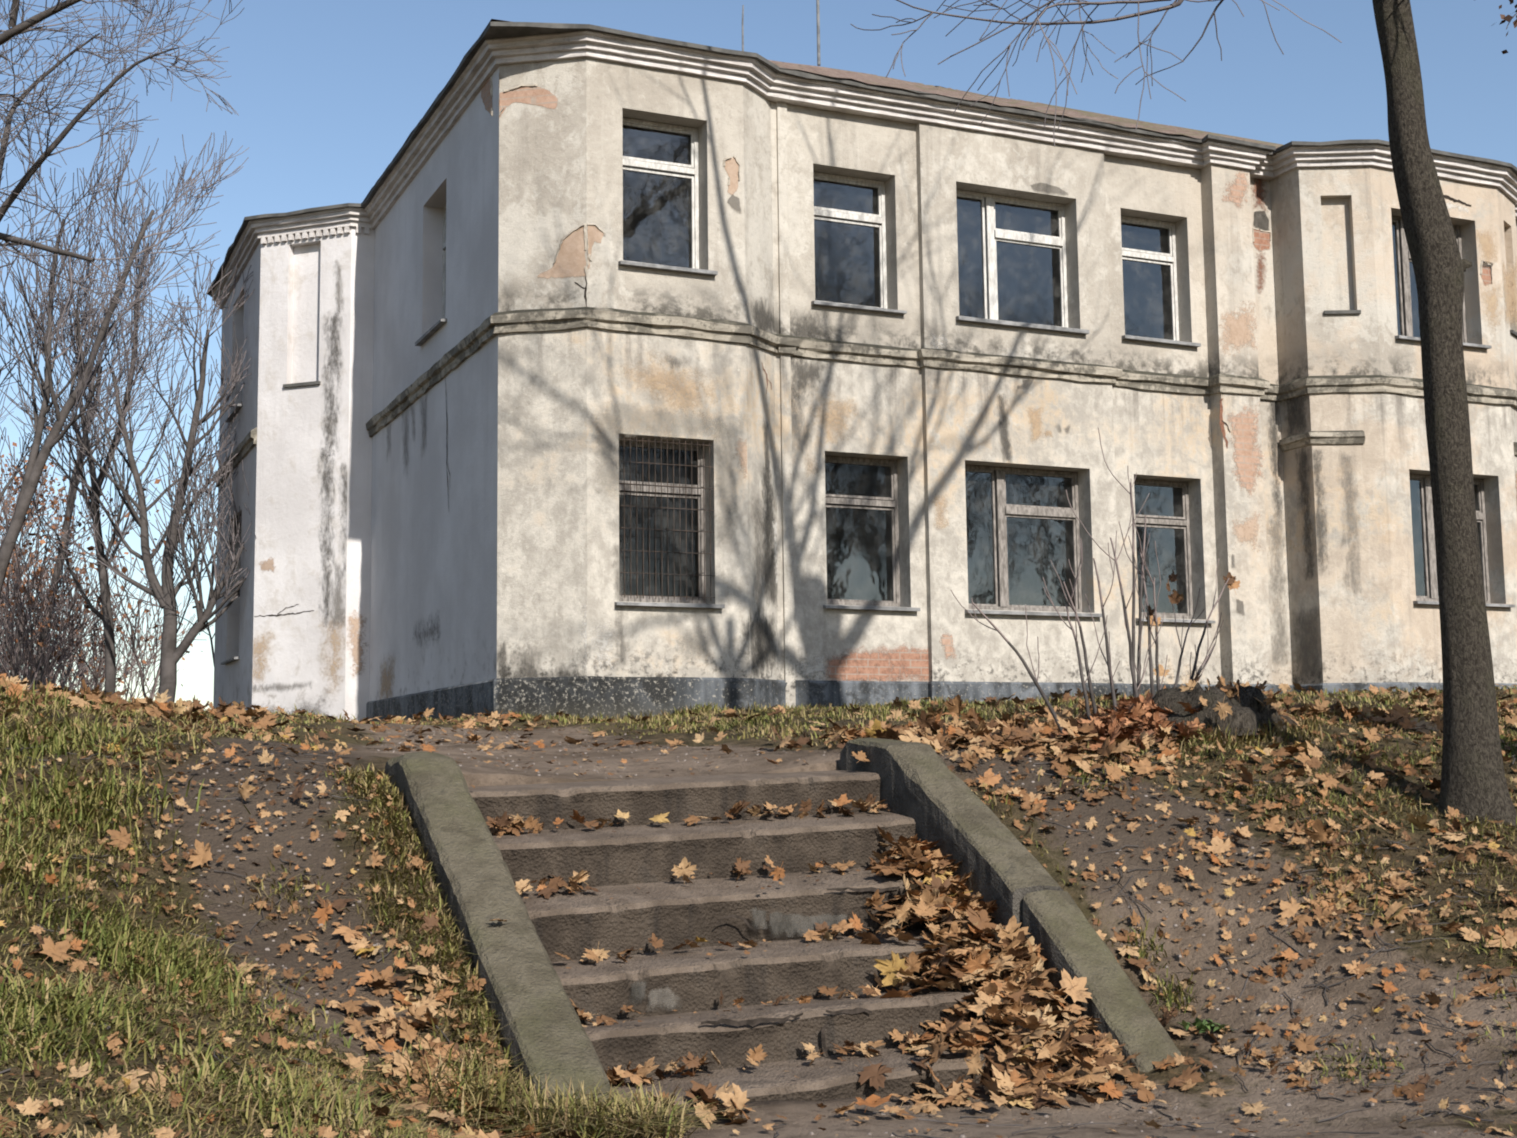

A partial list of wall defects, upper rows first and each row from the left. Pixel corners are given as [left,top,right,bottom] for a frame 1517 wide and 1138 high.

flaking render [481,73,558,118]
flaking render [723,157,740,212]
flaking render [538,223,605,279]
leakage [328,271,341,374]
leakage [320,389,347,623]
leakage [745,424,778,675]
peeling [1232,515,1259,566]
peeling [1228,407,1264,495]
leakage [1270,395,1328,592]
flaking render [804,634,956,681]